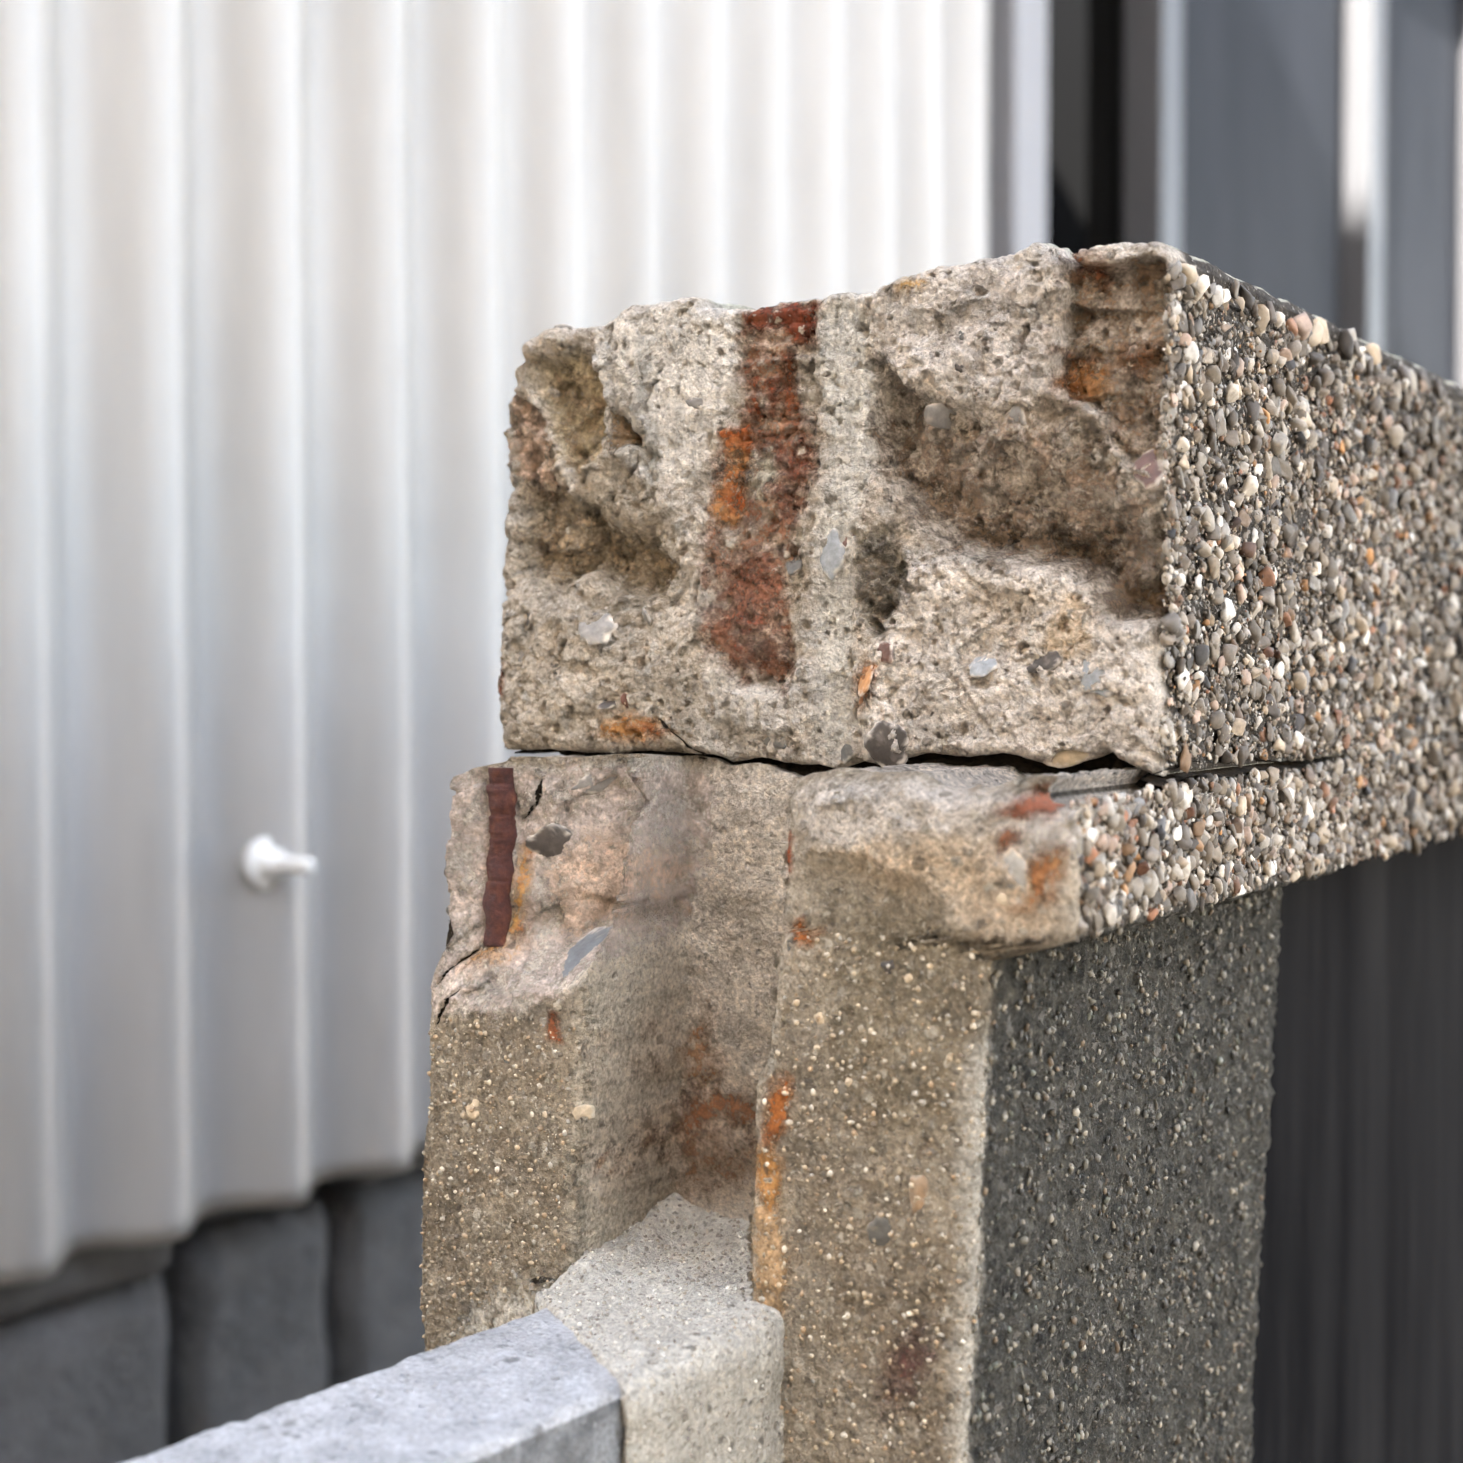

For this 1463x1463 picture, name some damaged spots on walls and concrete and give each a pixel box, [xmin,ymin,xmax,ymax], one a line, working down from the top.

rust [1073,249,1109,286]
rust [1054,343,1164,401]
spalling [511,361,678,581]
rust [699,301,819,694]
spalling [870,257,1170,619]
spalling [855,527,912,623]
crack [515,718,1324,819]
rust [996,784,1065,850]
rust [471,845,532,966]
rust [1012,846,1066,914]
rust [613,1021,791,1312]